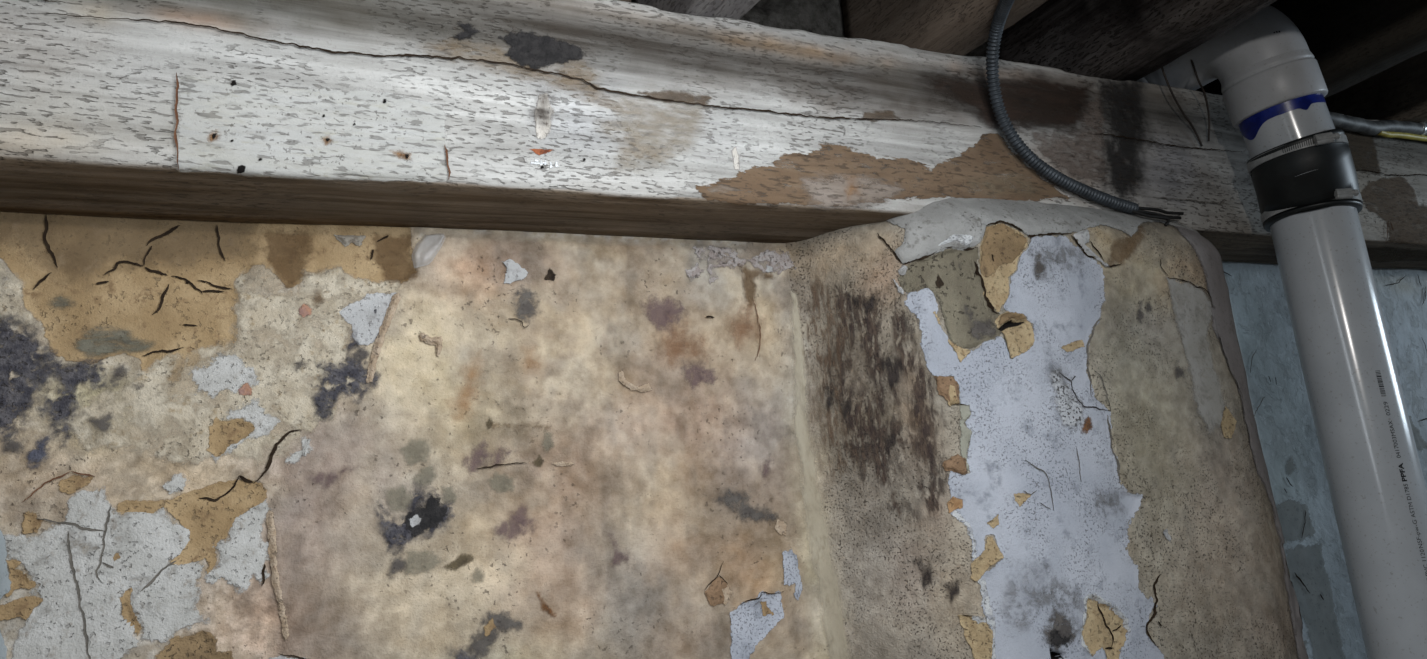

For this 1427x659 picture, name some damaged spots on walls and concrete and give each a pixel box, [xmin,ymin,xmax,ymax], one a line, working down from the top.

leakage [498,30,592,89]
crack [33,215,58,290]
crack [96,225,233,356]
leakage [0,316,127,468]
crack [24,471,114,659]
spalling [0,212,417,659]
crack [200,429,300,501]
leakage [296,339,381,419]
leakage [377,441,483,581]
peeling [705,519,802,659]
leakage [808,279,944,517]
peeling [893,222,1164,659]